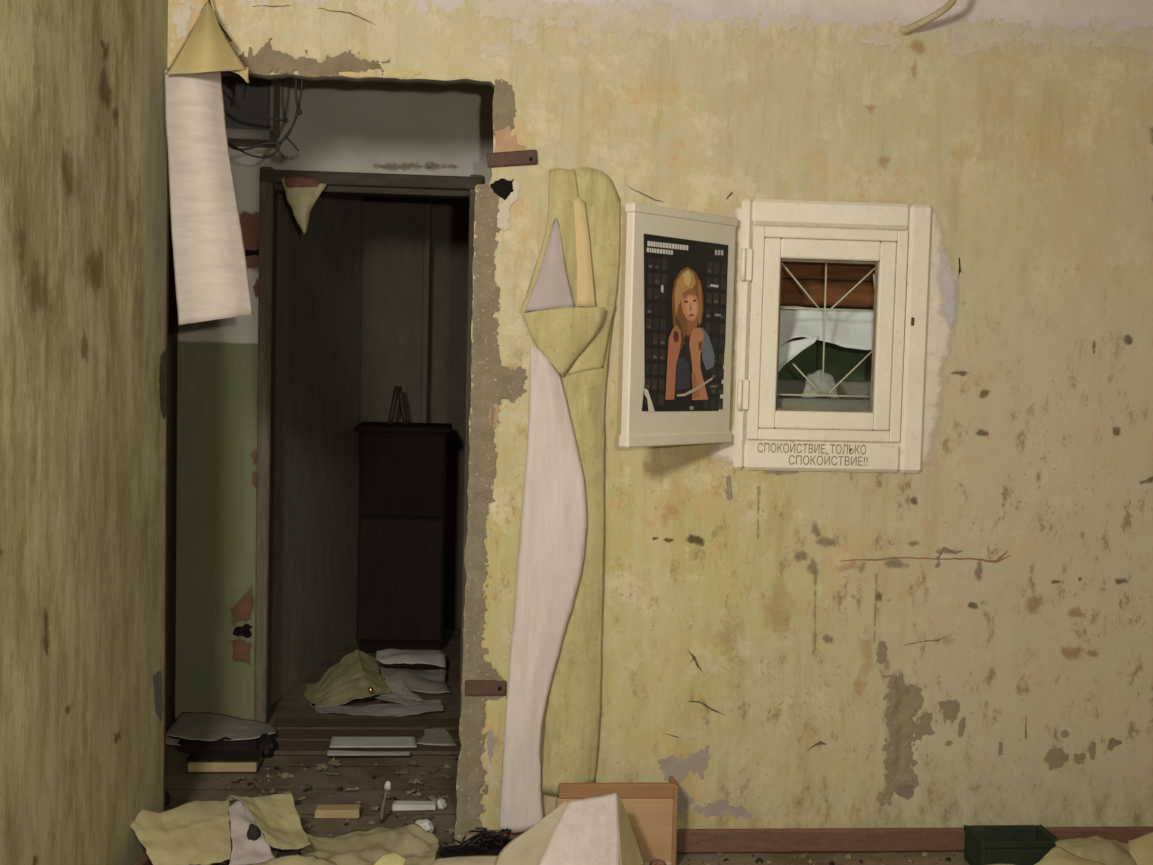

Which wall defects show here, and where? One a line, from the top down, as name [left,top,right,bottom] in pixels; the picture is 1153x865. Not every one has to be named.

peeling [169,0,196,49]
spalling [236,38,420,79]
spalling [493,79,531,153]
spalling [240,212,260,297]
spalling [454,178,527,845]
crack [840,547,1010,563]
spalling [232,587,254,663]
spalling [657,745,752,818]
spalling [876,641,966,806]
spalling [1044,730,1122,770]